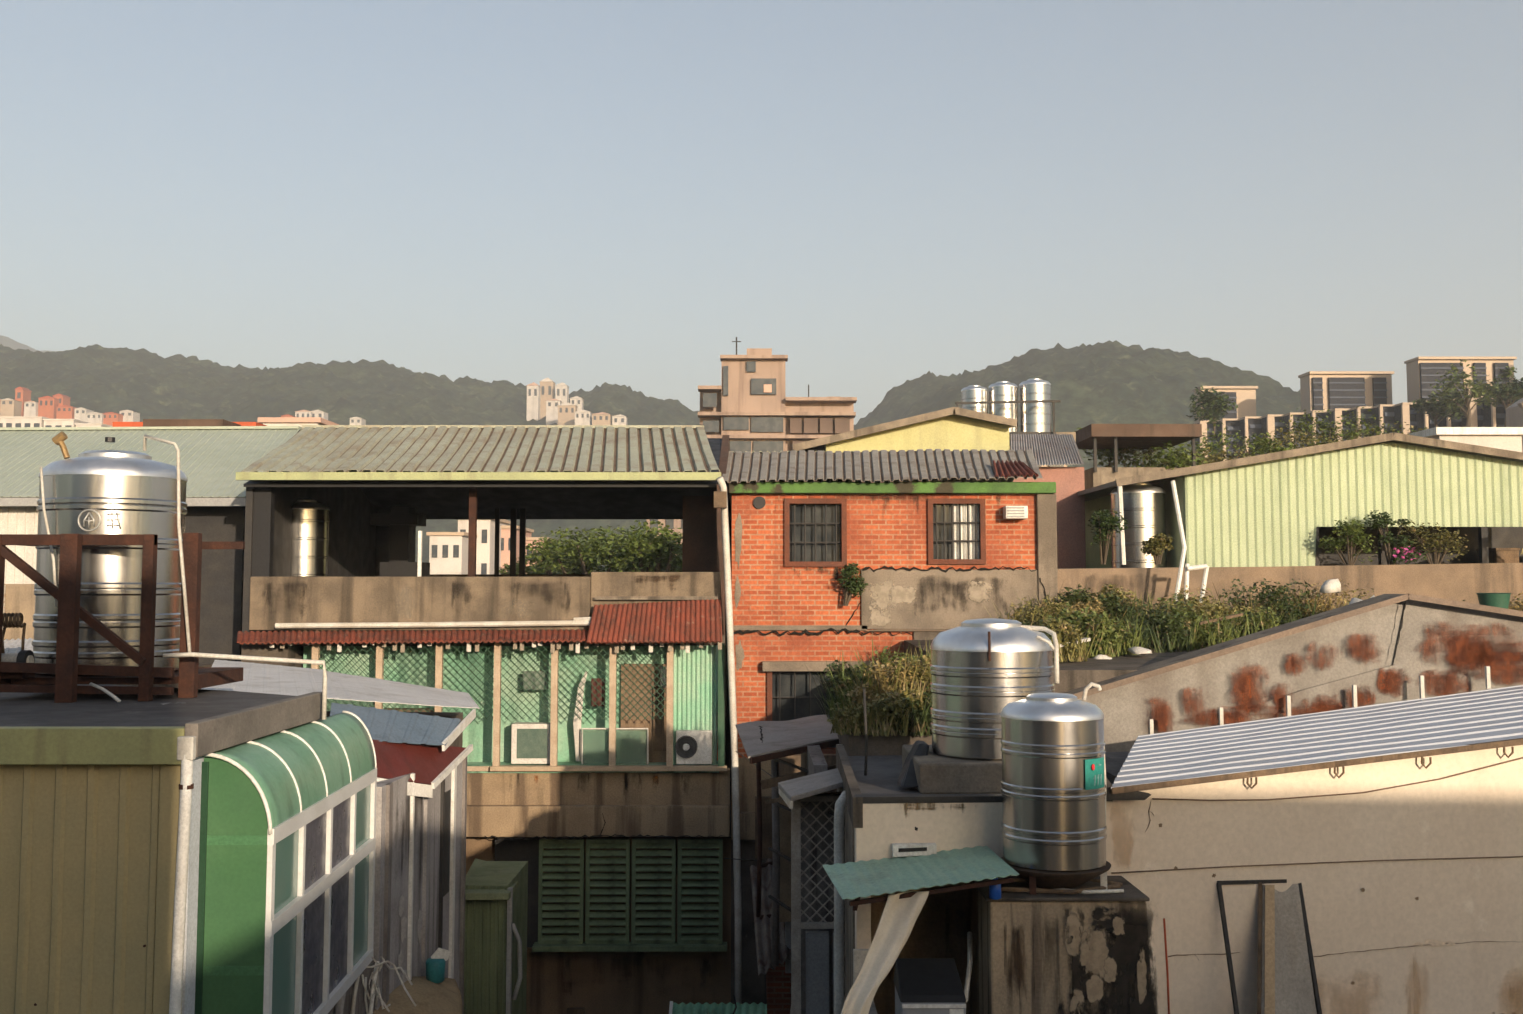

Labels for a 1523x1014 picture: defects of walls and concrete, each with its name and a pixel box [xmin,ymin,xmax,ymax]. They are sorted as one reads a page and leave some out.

damp [636,575,680,586]
damp [921,578,998,603]
rust [1152,624,1523,732]
peeling [1064,913,1125,1014]
peeling [1137,948,1147,1005]